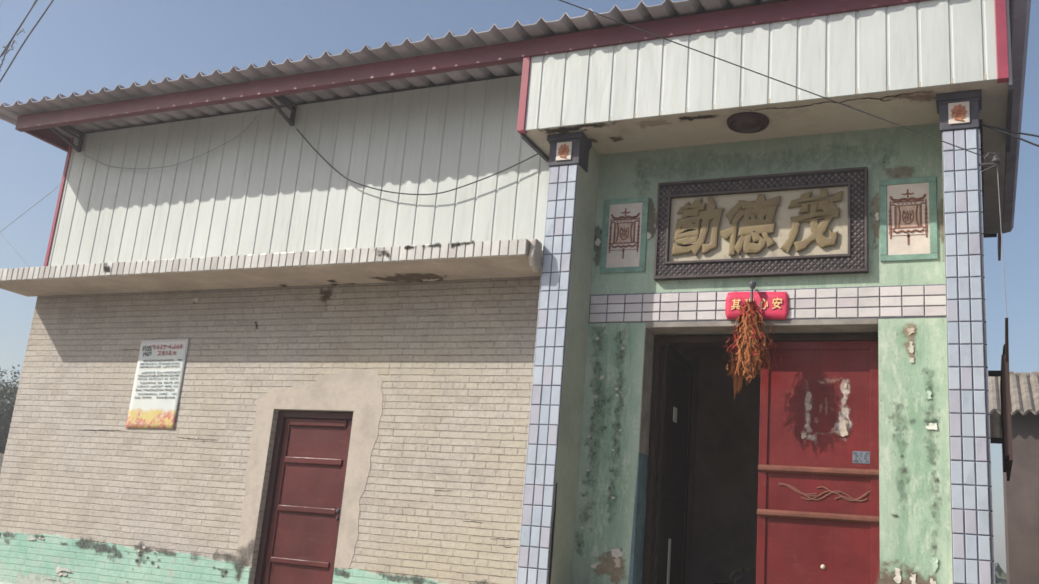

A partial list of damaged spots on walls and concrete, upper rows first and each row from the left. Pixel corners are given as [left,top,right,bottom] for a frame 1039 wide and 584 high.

spalling [404,240,474,249]
peeling [902,323,916,363]
water stain [577,328,625,553]
spalling [591,548,624,584]
spalling [877,557,938,584]